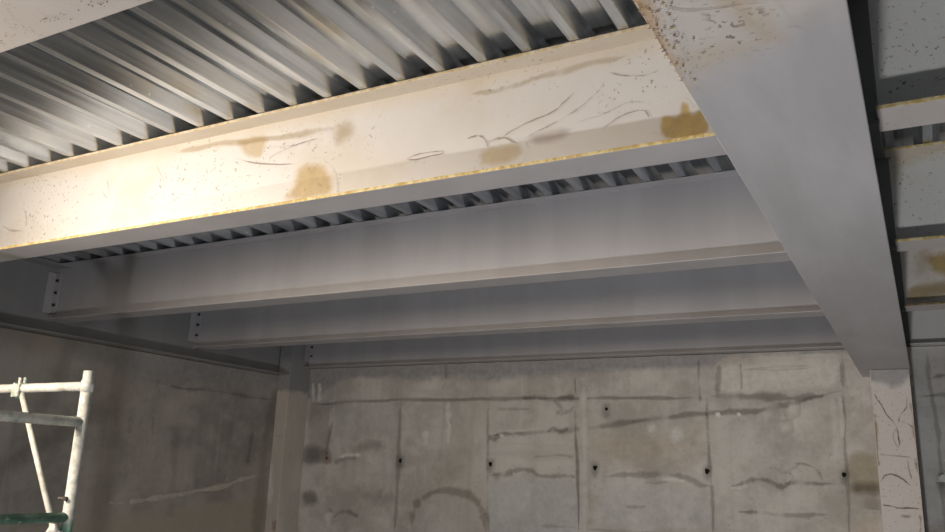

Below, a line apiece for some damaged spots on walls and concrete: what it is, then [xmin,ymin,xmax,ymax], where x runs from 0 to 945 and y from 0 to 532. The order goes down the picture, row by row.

corrosion [633,0,712,140]